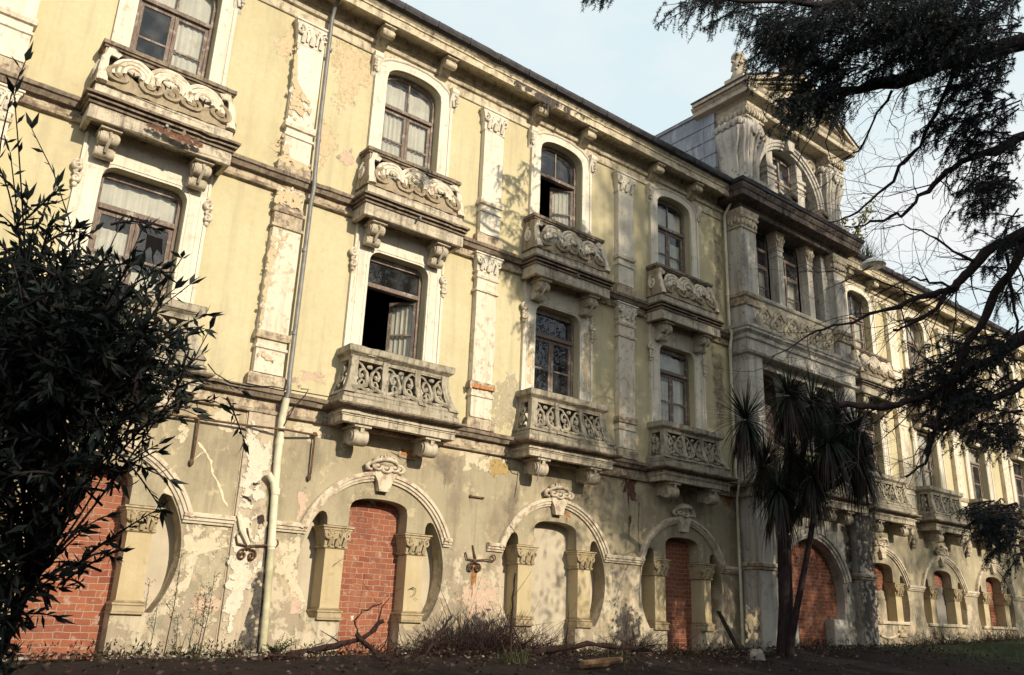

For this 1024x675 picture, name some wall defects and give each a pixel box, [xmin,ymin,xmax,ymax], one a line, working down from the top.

peeling [268,24,374,173]
peeling [259,228,290,326]
crack [195,442,228,507]
peeling [172,405,309,656]